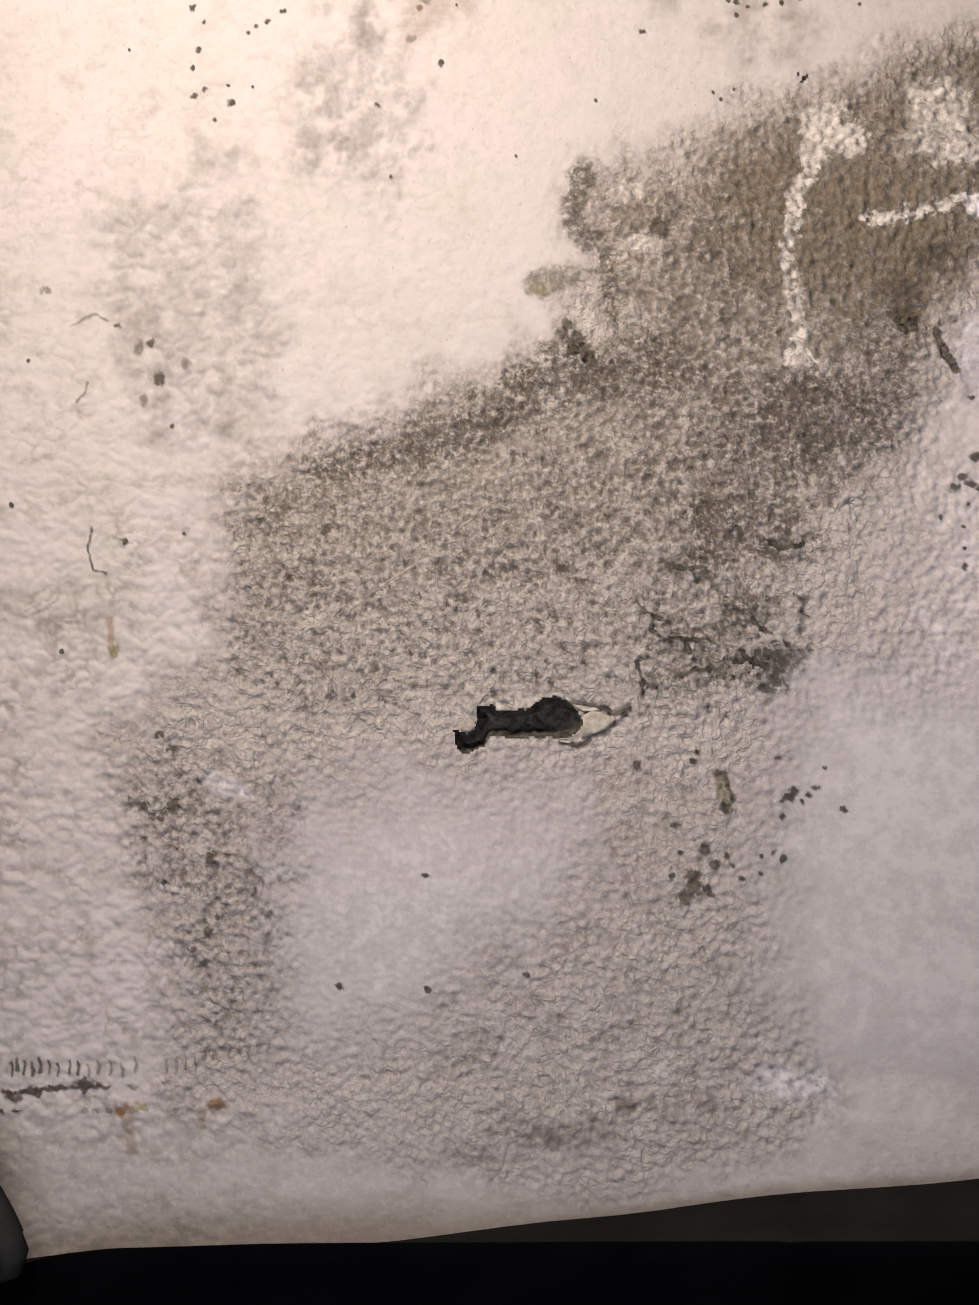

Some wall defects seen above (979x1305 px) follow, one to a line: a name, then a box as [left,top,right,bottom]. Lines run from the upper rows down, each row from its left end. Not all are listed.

water stain [247,54,979,621]
water stain [140,372,164,405]
mould [649,592,804,693]
mould [128,730,280,970]
peeling [269,795,569,1046]
mould [669,841,787,905]
mould [780,786,820,819]
crack [0,1057,197,1113]